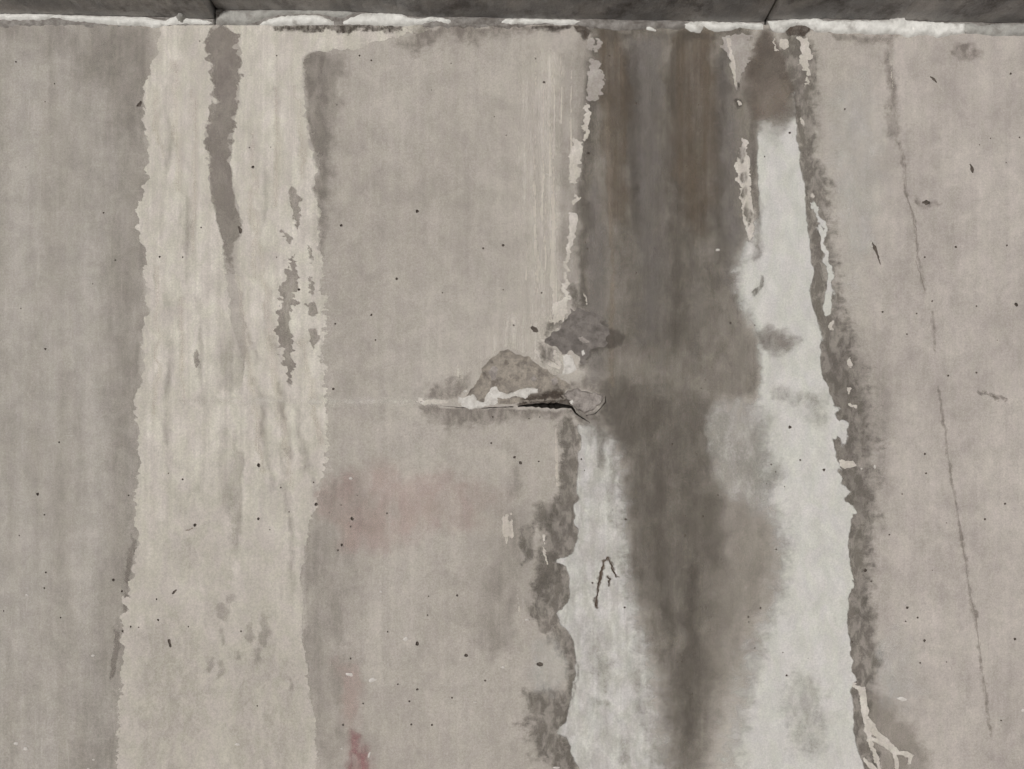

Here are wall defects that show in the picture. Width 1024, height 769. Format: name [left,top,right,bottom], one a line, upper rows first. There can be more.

leakage [110,25,429,769]
crack [446,396,606,423]
spalling [458,37,610,418]
crack [593,557,619,609]
leakage [518,27,914,769]